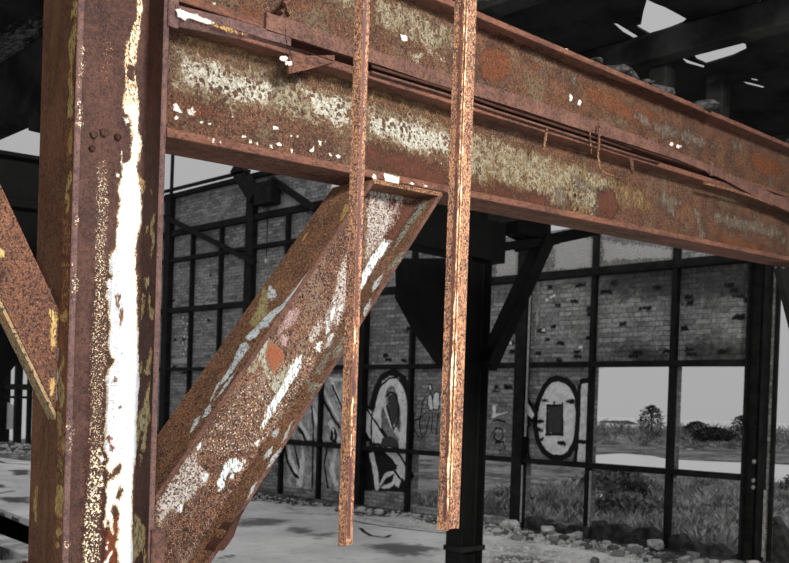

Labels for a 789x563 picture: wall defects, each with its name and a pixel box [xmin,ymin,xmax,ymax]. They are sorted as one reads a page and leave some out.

peeling [175,8,248,35]
peeling [172,103,211,125]
rust [477,29,708,126]
peeling [82,0,156,563]
peeling [361,173,427,317]
rust [347,0,463,538]
rust [471,180,557,208]
rust [595,181,622,220]
rust [703,182,773,206]
rust [78,266,125,563]
peeling [154,253,356,527]
peeling [206,482,258,551]